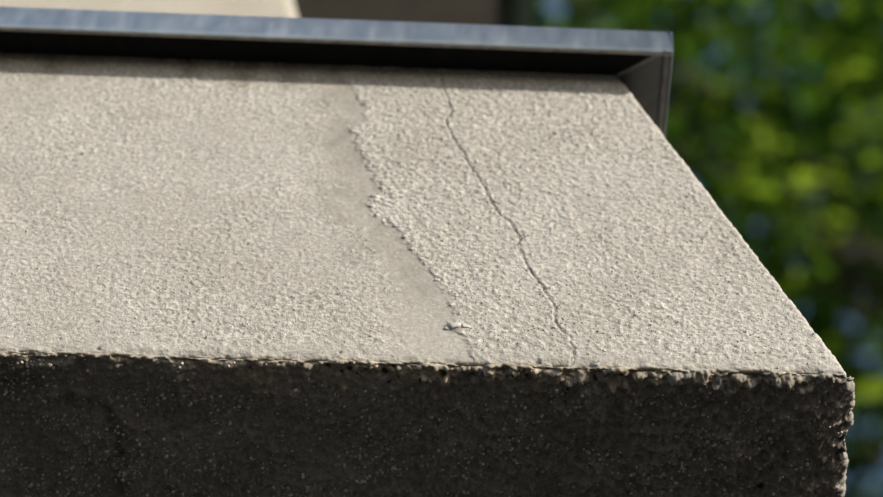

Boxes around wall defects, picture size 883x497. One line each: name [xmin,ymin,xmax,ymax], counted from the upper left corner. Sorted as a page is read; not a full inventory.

crack [434,105,474,172]
crack [489,199,575,409]